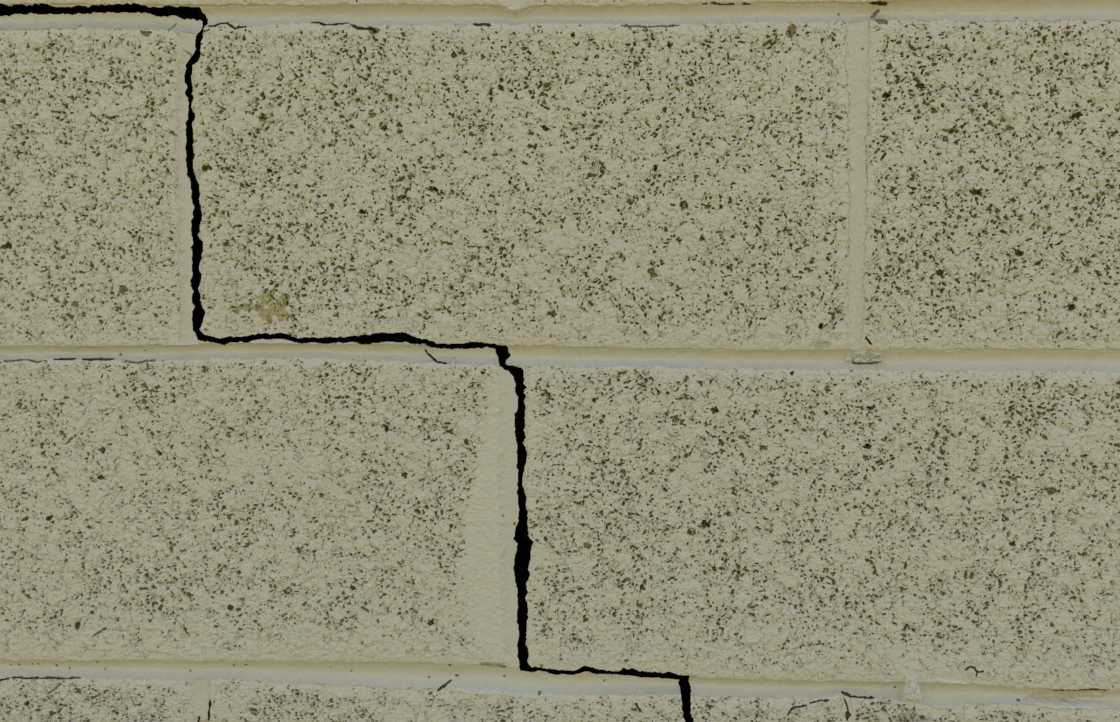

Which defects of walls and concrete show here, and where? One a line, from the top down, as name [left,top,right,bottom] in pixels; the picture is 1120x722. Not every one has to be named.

crack [0,0,694,722]
crack [702,0,751,8]